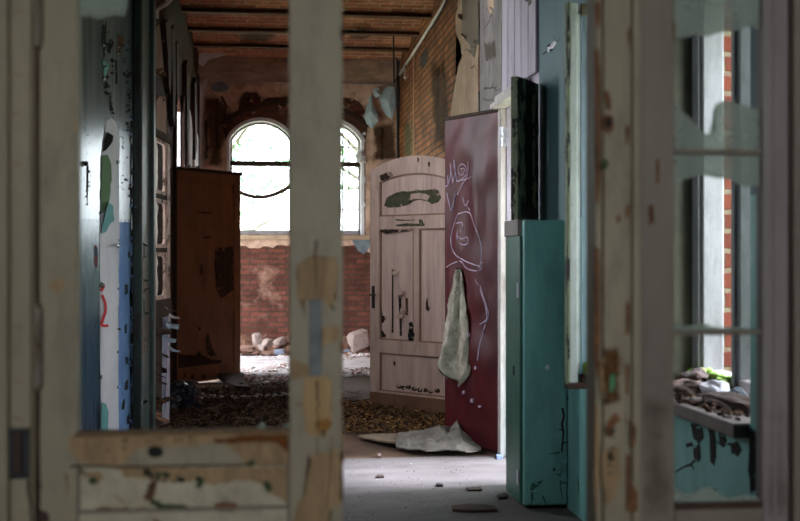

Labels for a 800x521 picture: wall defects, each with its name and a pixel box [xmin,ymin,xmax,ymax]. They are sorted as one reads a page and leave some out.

peeling [458,0,494,57]
peeling [343,86,396,141]
peeling [81,22,150,430]
peeling [118,466,287,501]
crack [531,408,579,509]
peeling [686,423,742,466]